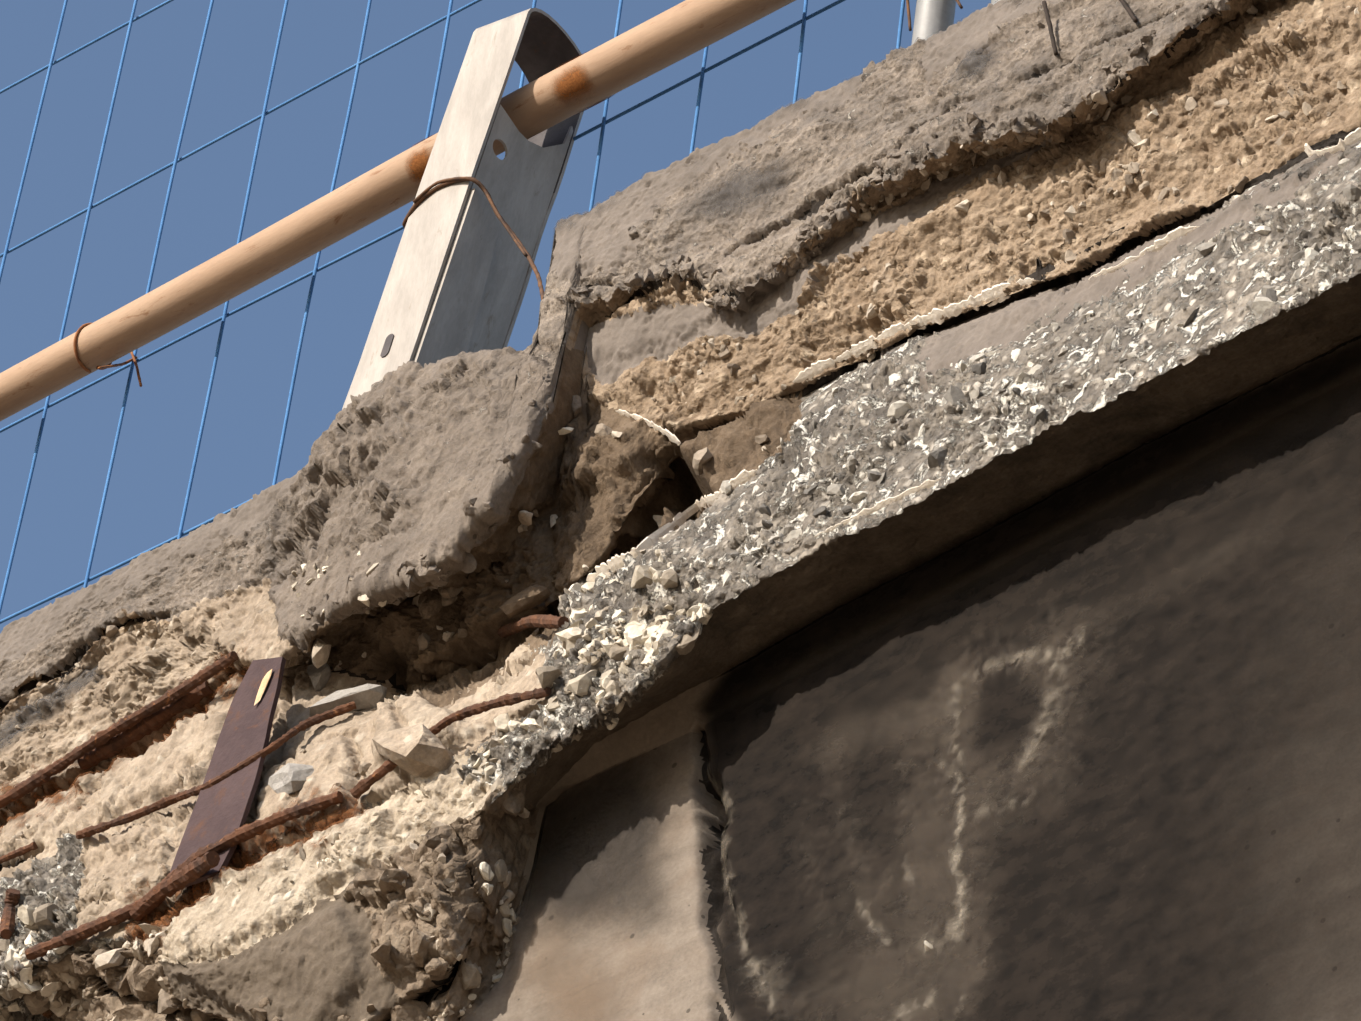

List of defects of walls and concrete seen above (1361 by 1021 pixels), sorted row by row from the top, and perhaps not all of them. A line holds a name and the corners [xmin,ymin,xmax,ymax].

crack [749,147,901,244]
spalling [582,0,1361,609]
crack [1039,203,1198,284]
crack [0,617,155,709]
rust [0,651,249,830]
rust [76,701,356,840]
spalling [0,273,803,1021]
rust [429,687,552,735]
rust [0,888,21,939]
rust [25,759,398,960]
crack [699,729,734,1021]
damp [951,853,965,937]